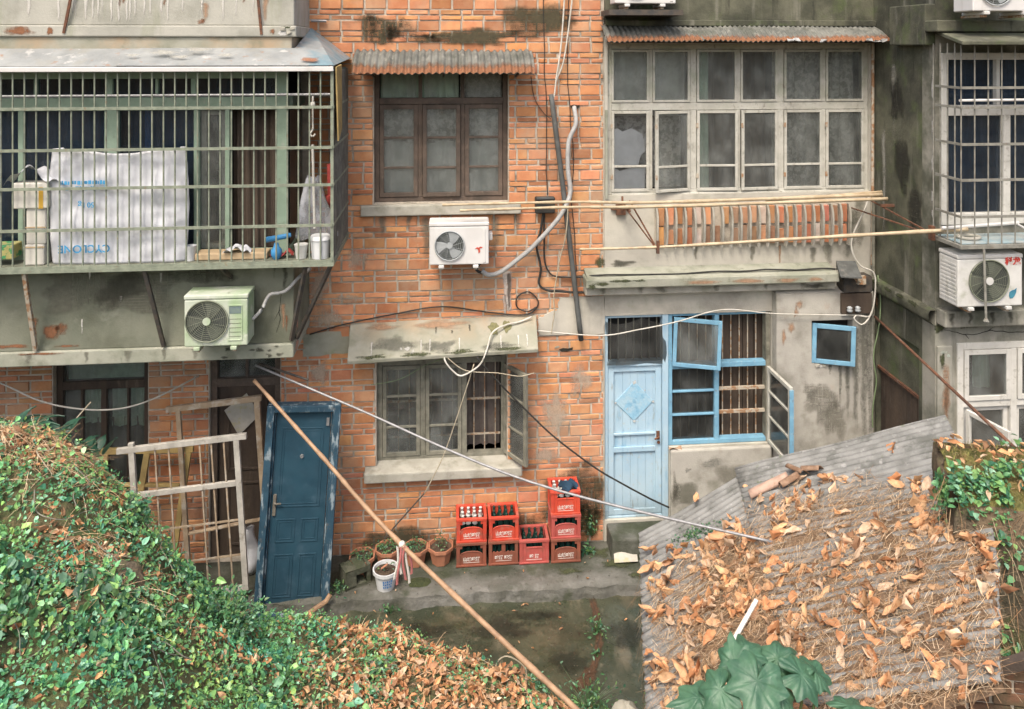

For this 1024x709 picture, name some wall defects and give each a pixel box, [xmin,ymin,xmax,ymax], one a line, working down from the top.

corrosion [6,26,30,35]
damp [362,6,575,45]
damp [891,66,903,119]
damp [882,132,922,228]
damp [371,325,470,354]